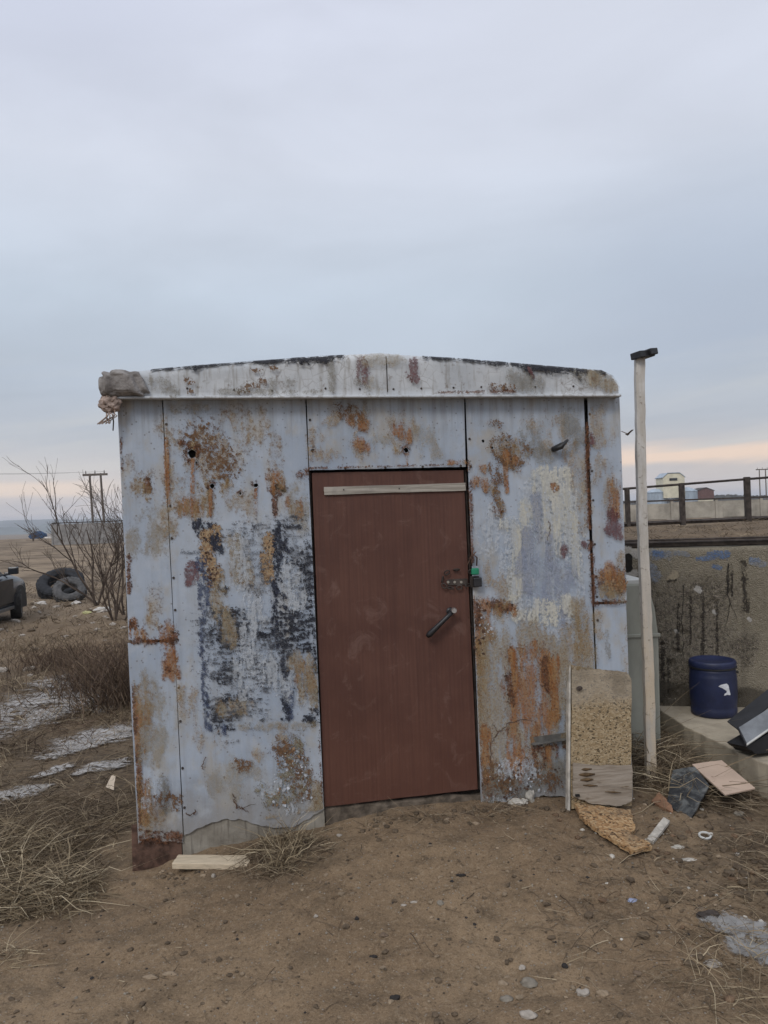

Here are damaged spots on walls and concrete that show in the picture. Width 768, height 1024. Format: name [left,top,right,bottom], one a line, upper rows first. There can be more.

peeling [198,524,276,588]
corrosion [120,365,626,800]
damp [726,560,750,613]
damp [659,588,719,706]
corrosion [132,677,183,845]